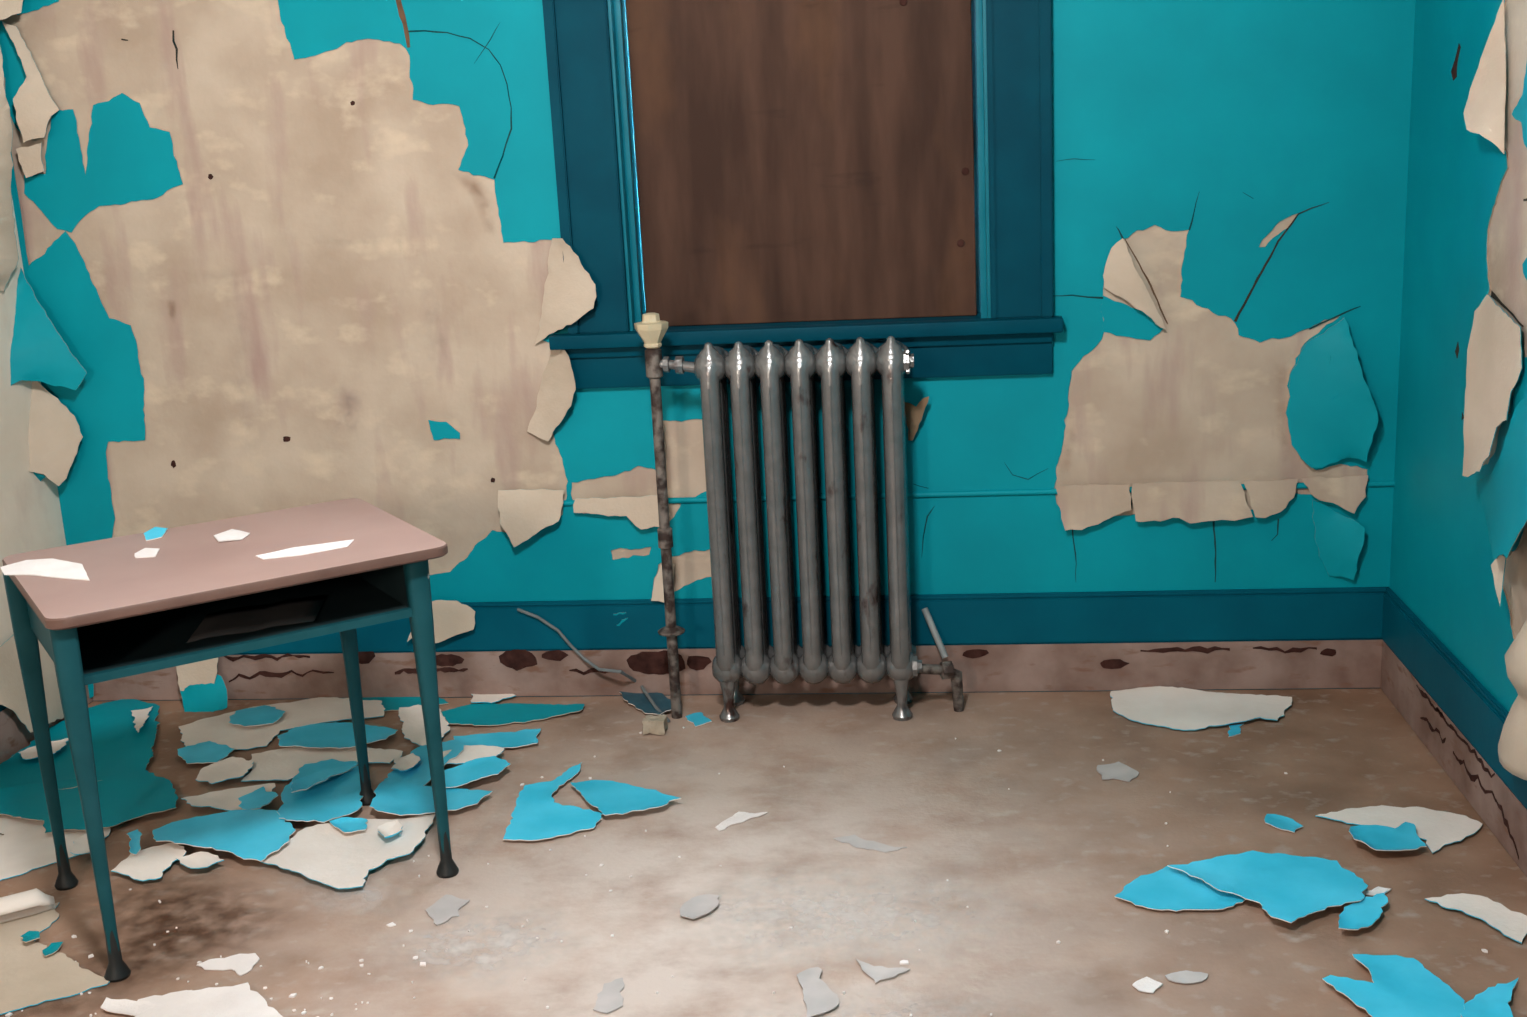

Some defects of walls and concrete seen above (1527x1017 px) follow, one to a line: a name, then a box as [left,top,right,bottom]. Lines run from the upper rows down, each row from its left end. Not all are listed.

crack [396,0,512,179]
peeling [0,0,706,581]
crack [1053,293,1103,301]
crack [1117,228,1168,324]
peeling [1259,214,1297,247]
crack [1234,202,1329,322]
crack [1309,306,1361,330]
peeling [1451,0,1527,637]
peeling [1054,225,1378,580]
peeling [611,547,711,602]
peeling [432,600,475,673]